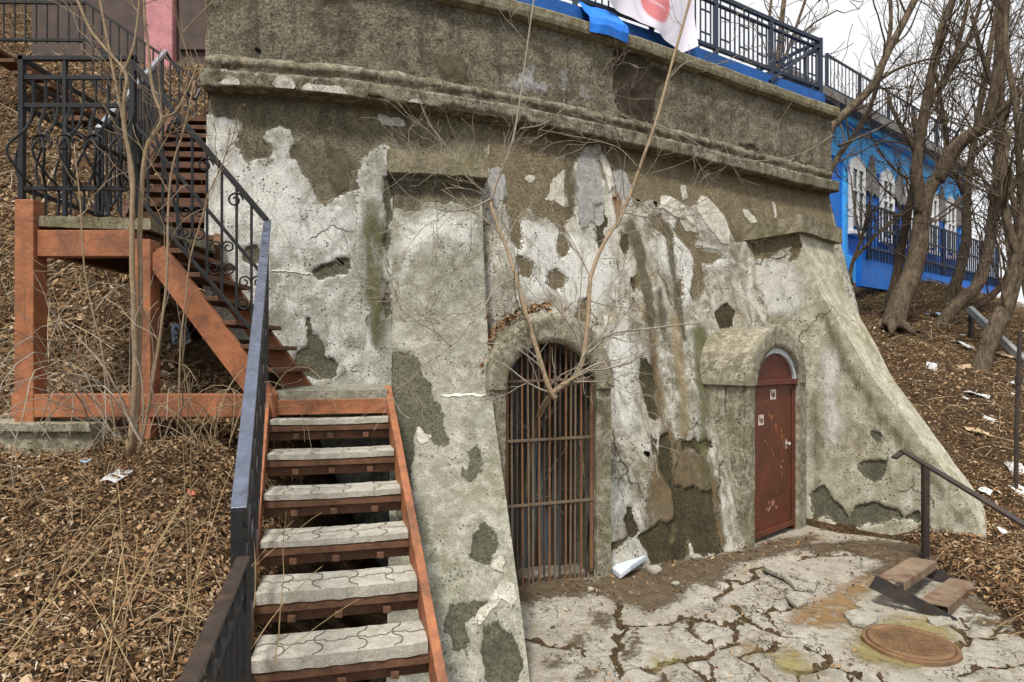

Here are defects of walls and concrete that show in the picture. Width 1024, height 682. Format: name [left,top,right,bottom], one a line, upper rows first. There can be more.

spalling [208,75,835,304]
damp [363,202,384,344]
spalling [382,281,392,318]
spalling [391,352,450,487]
spalling [444,522,524,682]
damp [626,219,725,544]
crack [525,566,887,682]
crack [797,552,874,561]
spalling [809,485,921,528]
spalling [857,459,888,482]
crack [929,617,1024,677]